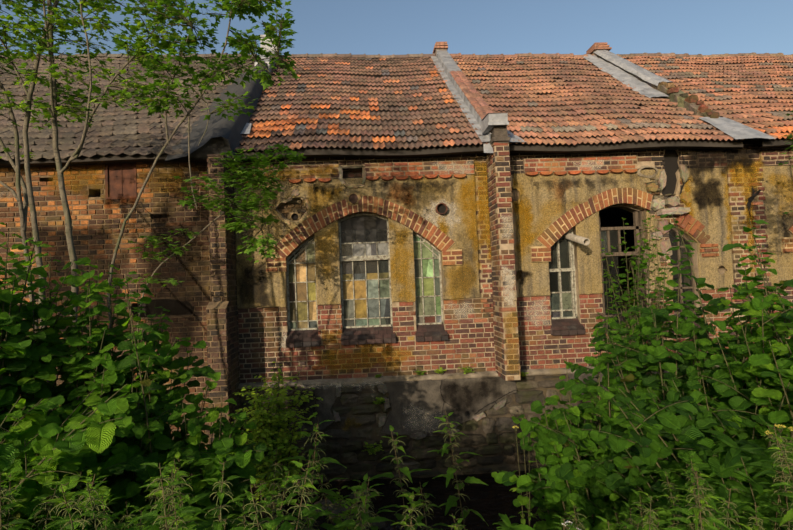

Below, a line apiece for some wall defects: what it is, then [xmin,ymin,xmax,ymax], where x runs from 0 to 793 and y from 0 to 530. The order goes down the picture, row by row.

peeling [658,170,667,191]
peeling [679,164,691,204]
spalling [273,189,311,225]
peeling [658,219,673,261]
damp [238,264,270,306]
flaking render [473,398,507,421]